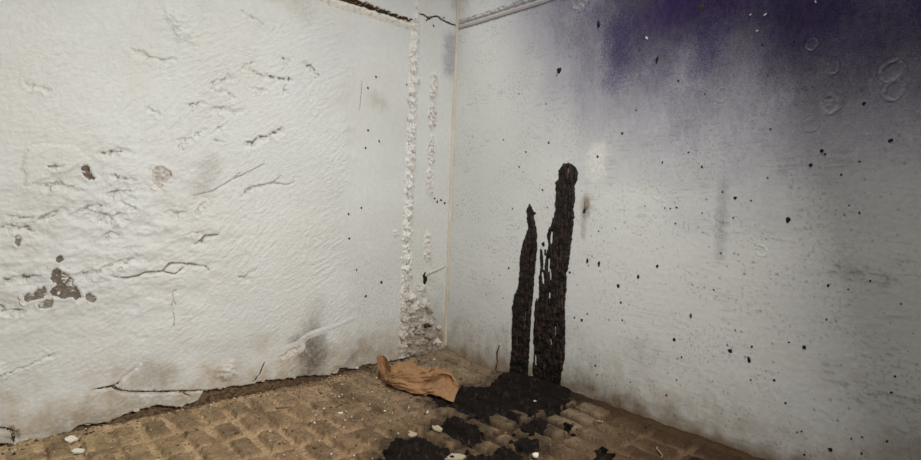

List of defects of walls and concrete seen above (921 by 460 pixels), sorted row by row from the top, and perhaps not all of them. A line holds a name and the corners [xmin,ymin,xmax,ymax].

crack [419,13,455,26]
spalling [243,50,326,87]
spalling [209,118,292,156]
spalling [237,178,266,199]
spalling [0,140,177,320]
crack [113,234,218,326]
spalling [276,340,306,362]
crack [95,382,201,396]